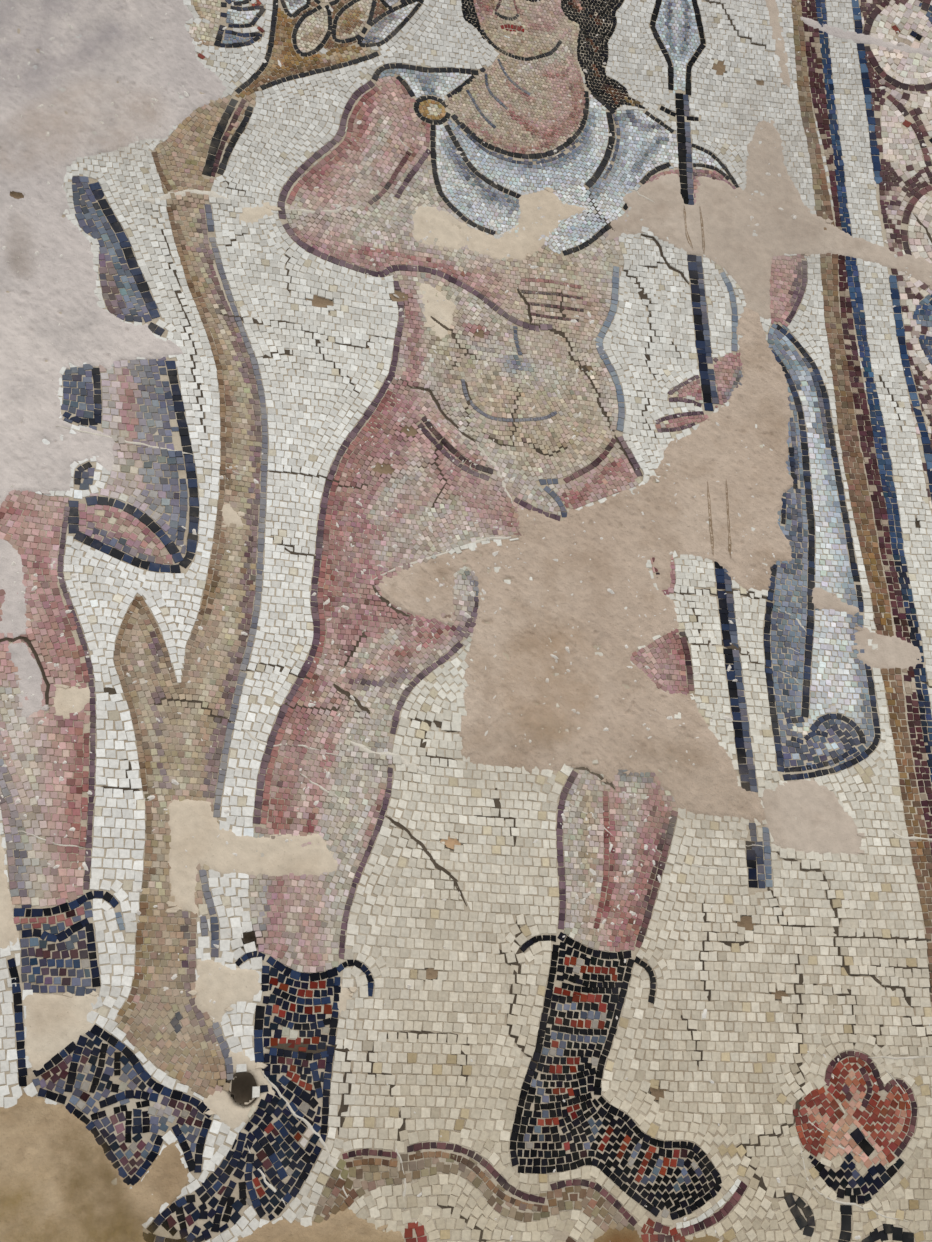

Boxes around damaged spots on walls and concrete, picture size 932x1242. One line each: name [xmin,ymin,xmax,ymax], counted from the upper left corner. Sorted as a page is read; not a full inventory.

spalling [0,0,226,507]
crack [56,181,387,489]
crack [394,316,568,508]
crack [517,189,689,476]
spalling [371,119,932,856]
spalling [0,539,91,719]
crack [154,697,457,799]
crack [242,631,370,715]
spalling [165,799,339,915]
spalling [0,1093,189,1242]
spalling [200,1049,276,1130]
crack [261,1030,469,1210]